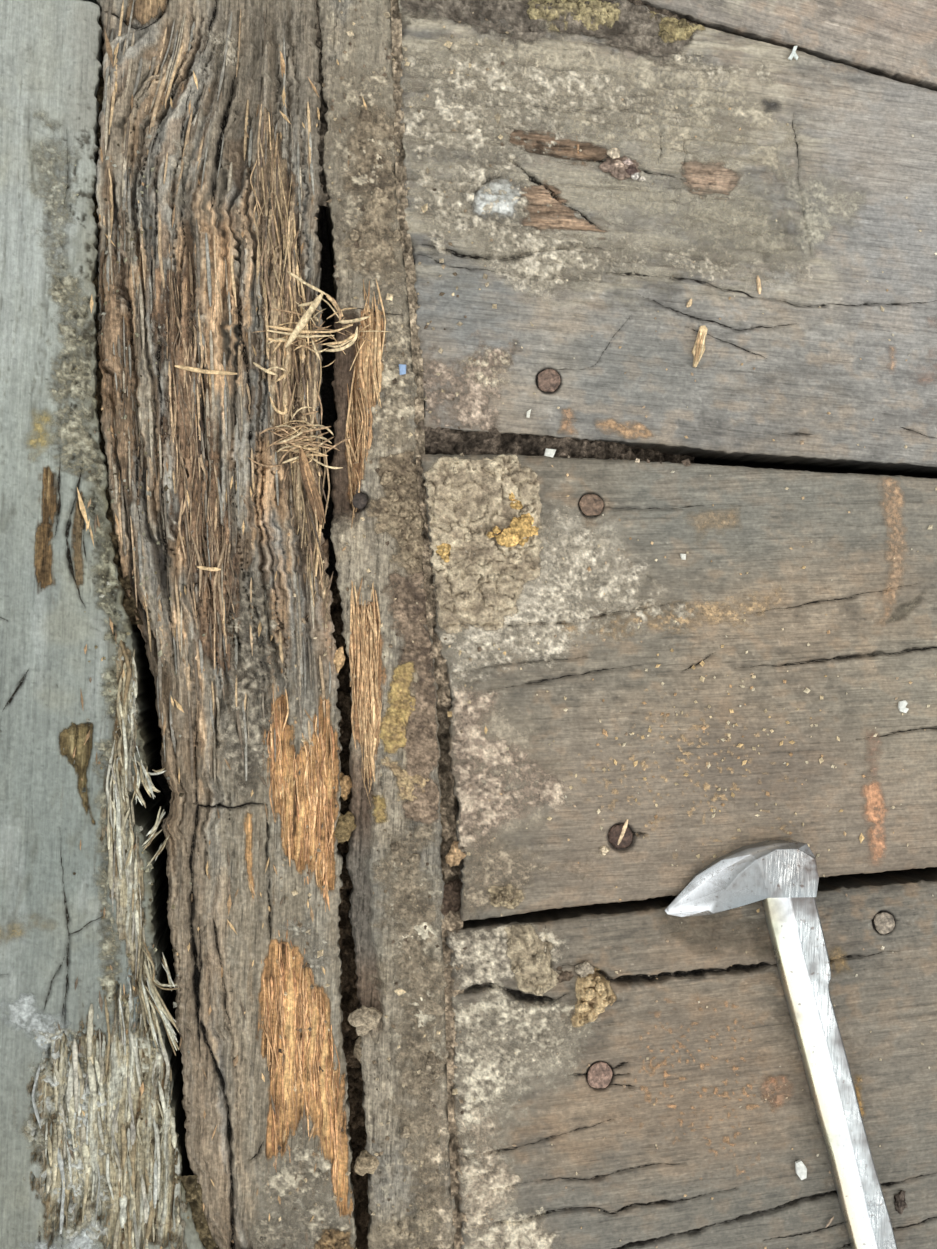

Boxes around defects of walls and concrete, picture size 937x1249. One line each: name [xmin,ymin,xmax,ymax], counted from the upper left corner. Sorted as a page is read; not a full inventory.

crack [418,244,550,273]
crack [475,154,792,359]
crack [822,299,934,307]
crack [757,583,918,613]
crack [470,656,625,689]
crack [740,647,937,668]
crack [469,925,568,1002]
crack [596,962,777,981]
peeling [256,920,353,1222]
peeling [24,1025,111,1245]
crack [880,1174,929,1186]
crack [531,1163,850,1249]